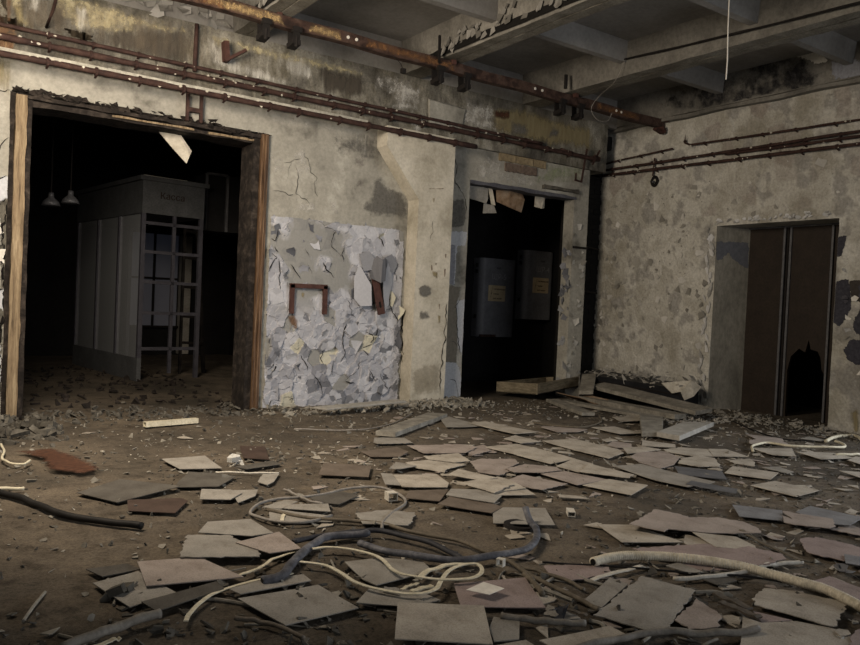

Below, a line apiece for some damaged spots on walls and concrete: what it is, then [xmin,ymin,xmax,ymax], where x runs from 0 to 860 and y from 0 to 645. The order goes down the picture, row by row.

water stain [668,60,813,107]
crack [281,149,317,200]
flaking render [499,153,546,176]
peeling [262,215,405,408]
peeling [596,180,831,404]
peeling [833,236,860,375]